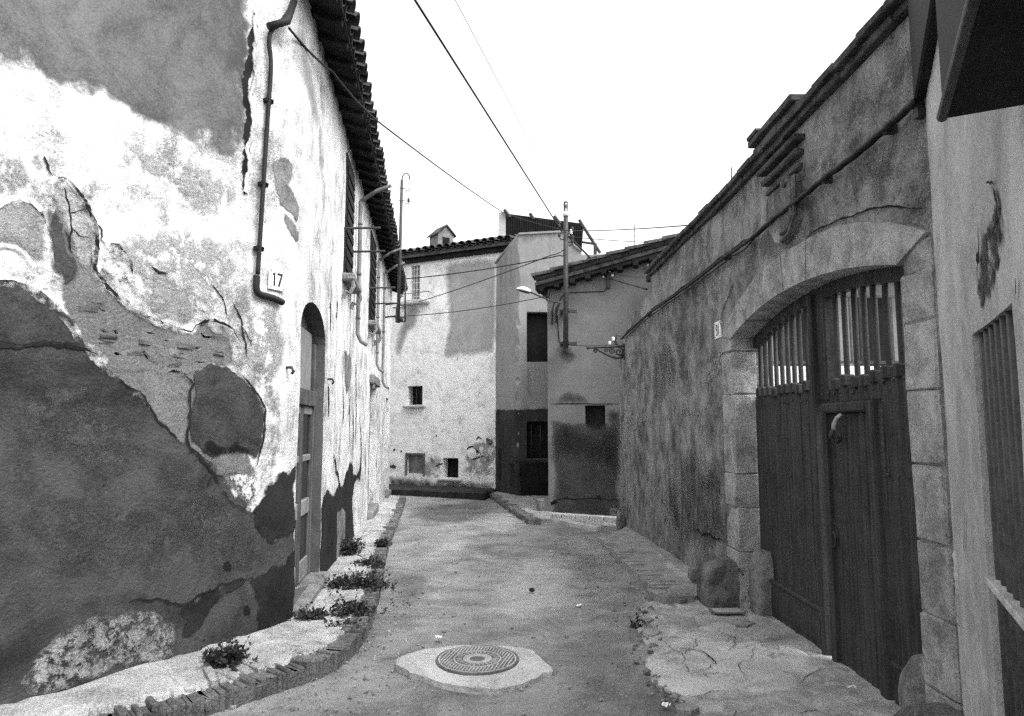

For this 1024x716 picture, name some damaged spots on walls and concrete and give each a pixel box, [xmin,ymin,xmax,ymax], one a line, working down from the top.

crack [241,12,258,195]
crack [0,156,267,465]
flaking render [0,145,299,705]
flaking render [336,507,346,561]
crack [665,636,826,678]